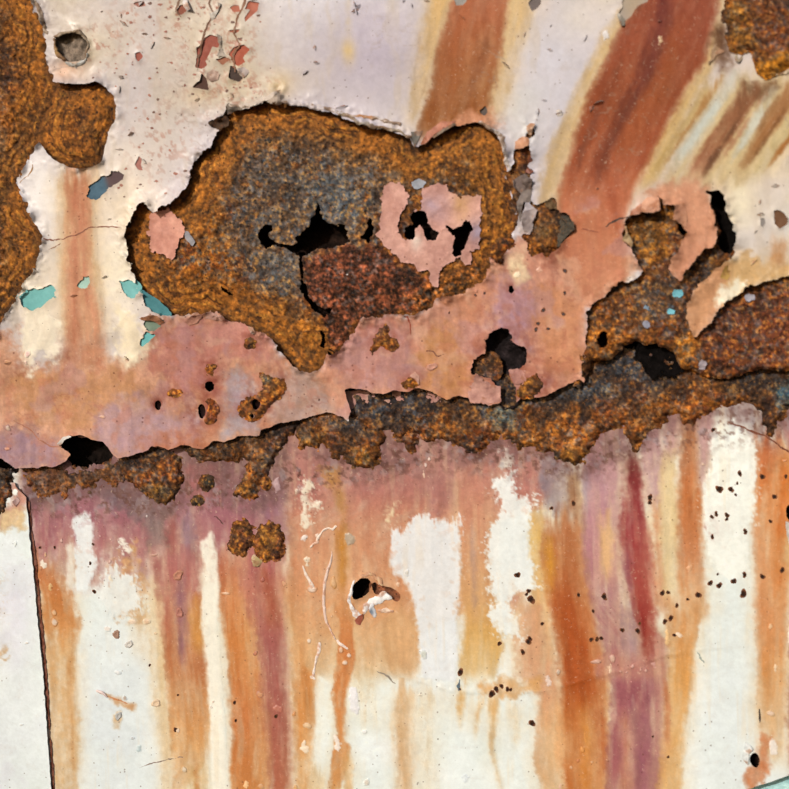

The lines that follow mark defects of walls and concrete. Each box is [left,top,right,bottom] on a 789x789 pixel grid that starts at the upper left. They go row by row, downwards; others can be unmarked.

peeling [617,0,648,26]
peeling [126,0,261,95]
peeling [86,143,153,201]
rust [124,0,535,373]
peeling [20,285,56,311]
peeling [77,276,90,289]
peeling [119,278,172,346]
rust [0,0,333,505]
peeling [468,374,502,406]
peeling [509,368,527,384]
rust [295,0,789,789]
rust [0,409,717,789]